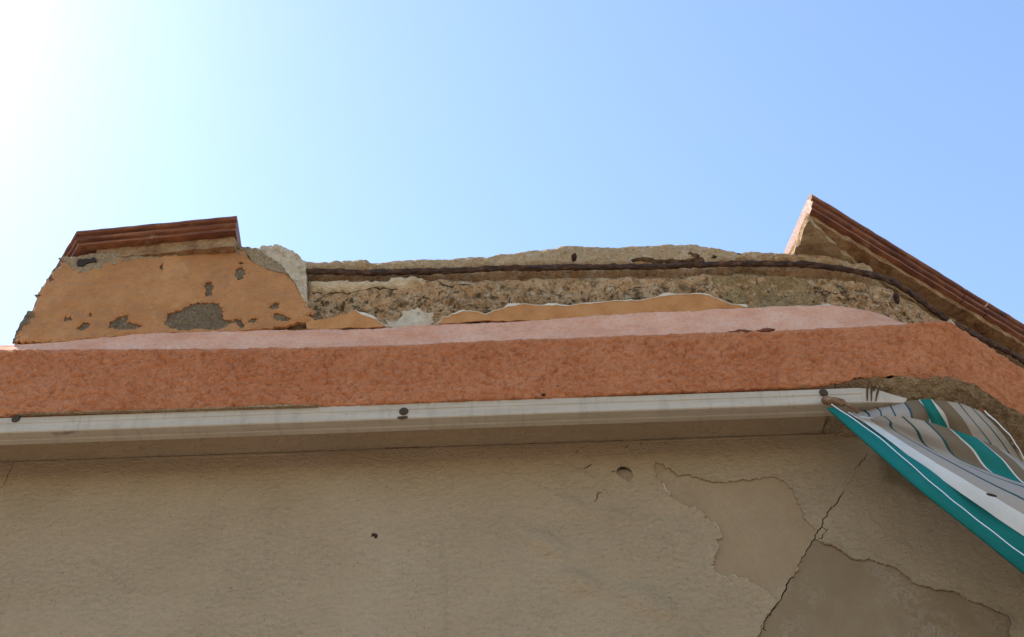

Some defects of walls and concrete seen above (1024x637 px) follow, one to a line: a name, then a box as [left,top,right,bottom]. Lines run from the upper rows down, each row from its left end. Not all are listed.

spalling [58,252,201,273]
spalling [12,311,35,343]
peeling [109,316,142,330]
peeling [165,283,256,331]
spalling [235,244,942,330]
crack [760,456,866,634]
flaking render [654,464,1011,637]